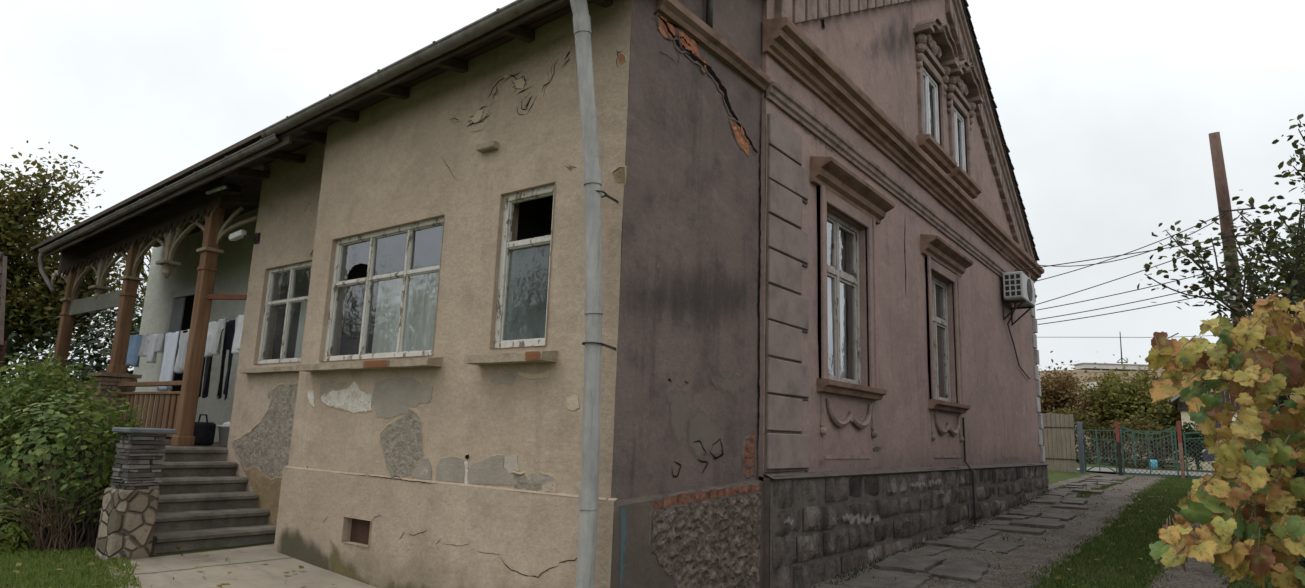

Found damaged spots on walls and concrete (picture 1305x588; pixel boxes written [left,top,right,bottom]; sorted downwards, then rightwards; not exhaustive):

crack [654,12,761,478]
peeling [231,379,373,526]
peeling [379,408,425,479]
flaking render [508,471,558,493]
crack [372,515,577,578]